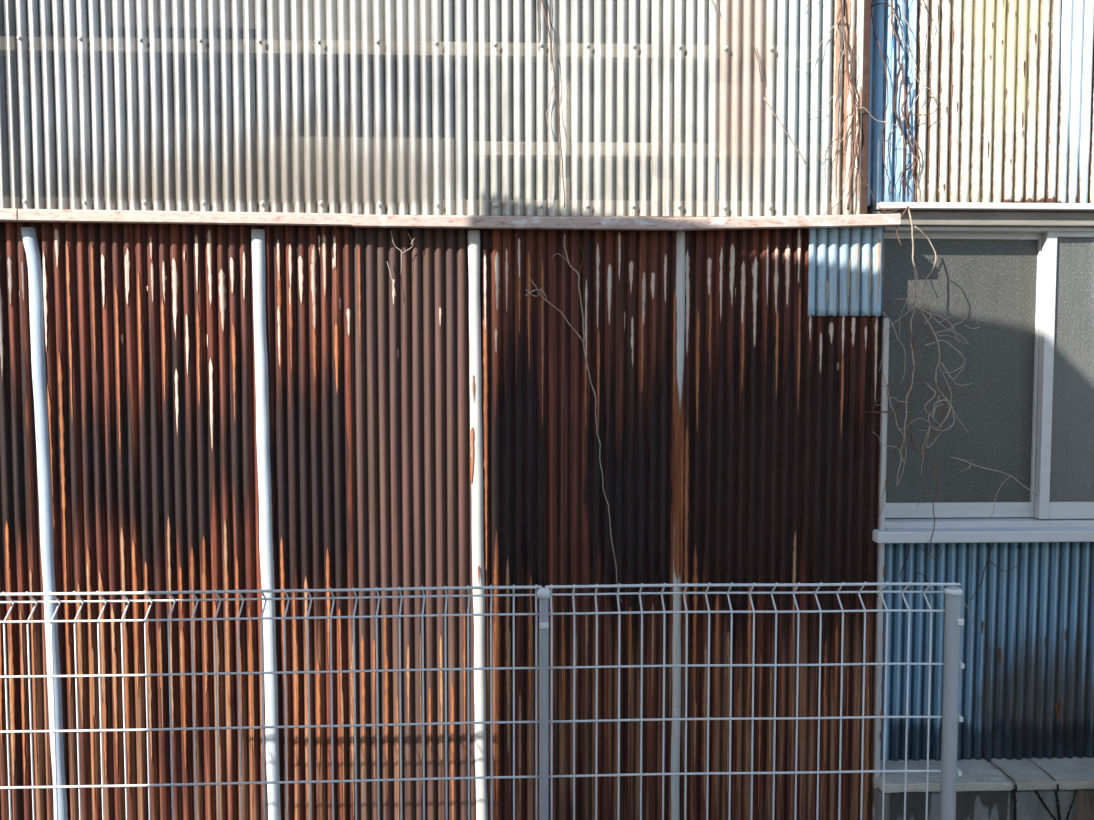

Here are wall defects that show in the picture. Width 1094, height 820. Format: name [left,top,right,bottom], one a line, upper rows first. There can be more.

rust [1004,188,1062,203]
rust [0,222,889,820]
damp [891,722,942,761]
damp [957,632,1094,762]